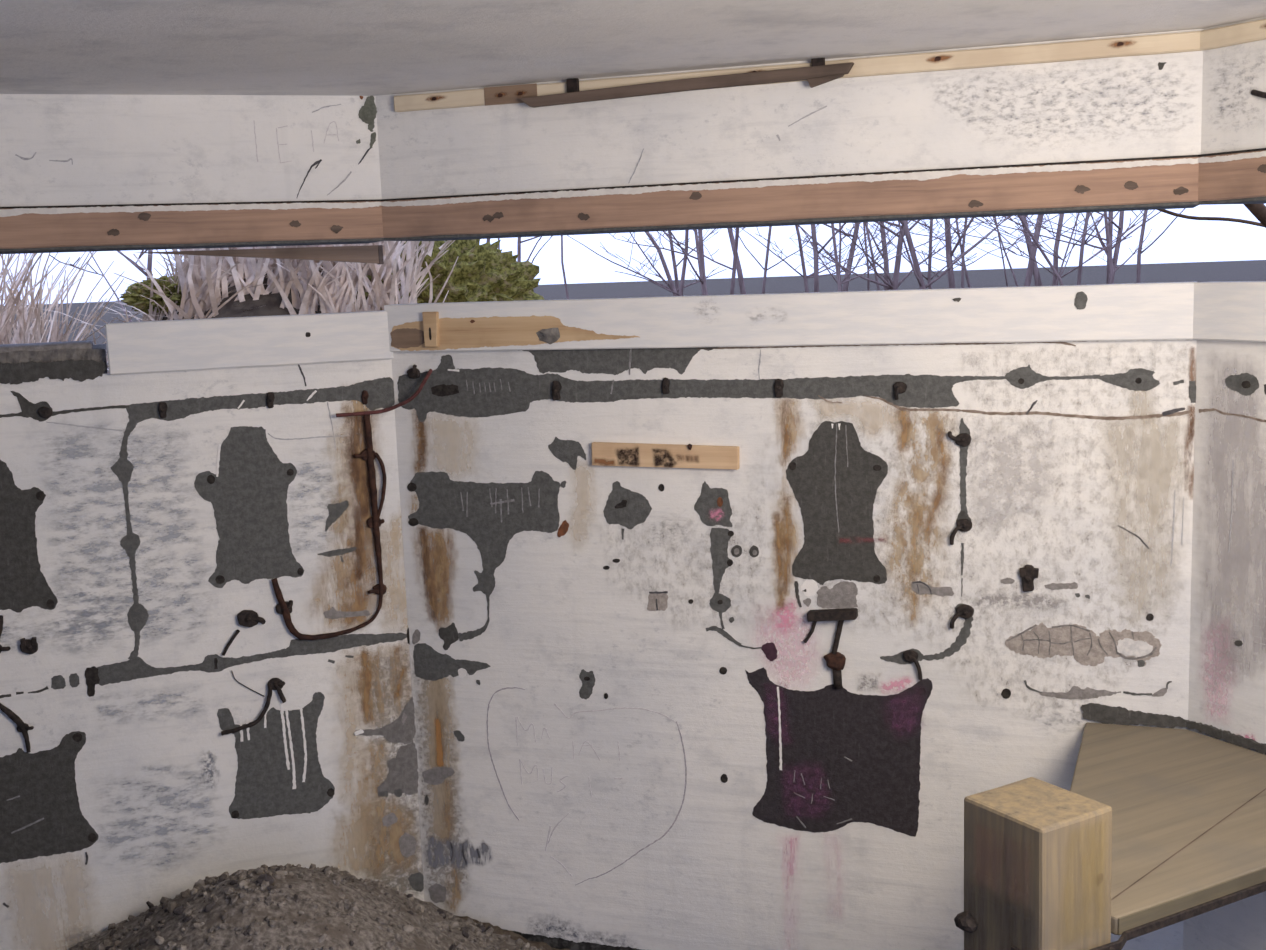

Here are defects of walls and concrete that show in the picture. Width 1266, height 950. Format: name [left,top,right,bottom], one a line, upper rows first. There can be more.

peeling [0,731,214,865]
peeling [173,426,349,610]
peeling [217,692,335,819]
rust [316,415,377,625]
rust [415,415,427,473]
rust [420,528,453,628]
peeling [346,437,586,903]
rust [775,493,796,606]
peeling [694,481,933,837]
peeling [786,421,888,609]
rust [889,411,946,621]
water stain [1207,370,1266,668]